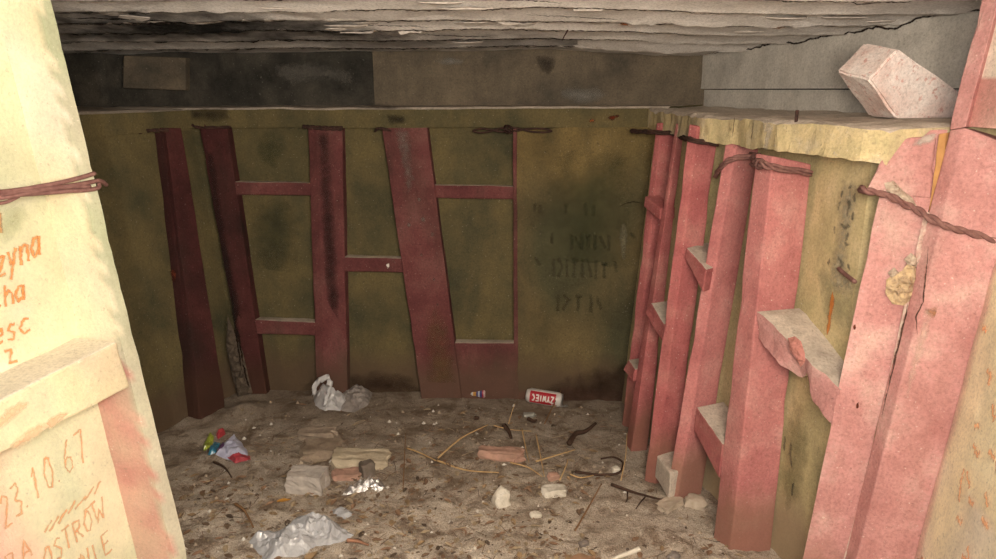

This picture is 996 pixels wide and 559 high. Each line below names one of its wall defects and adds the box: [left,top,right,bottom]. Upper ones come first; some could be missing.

crack [68,0,170,26]
crack [199,0,934,54]
crack [882,254,928,414]